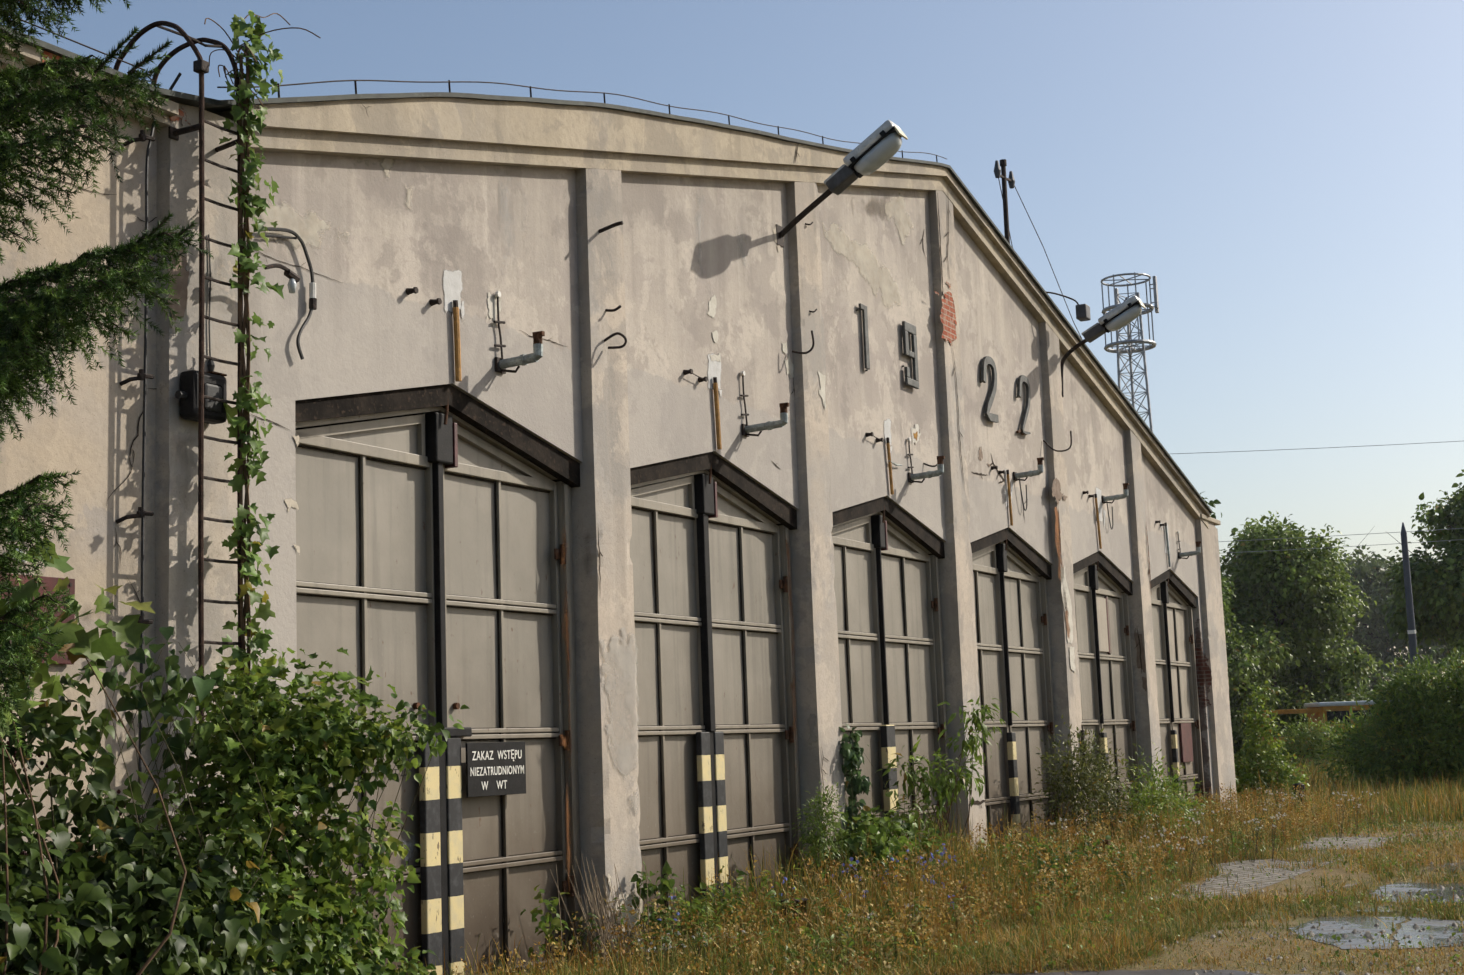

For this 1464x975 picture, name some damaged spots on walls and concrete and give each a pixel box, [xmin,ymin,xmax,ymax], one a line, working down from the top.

crack [29,135,157,232]
flaking render [935,281,957,346]
flaking render [1195,619,1212,799]